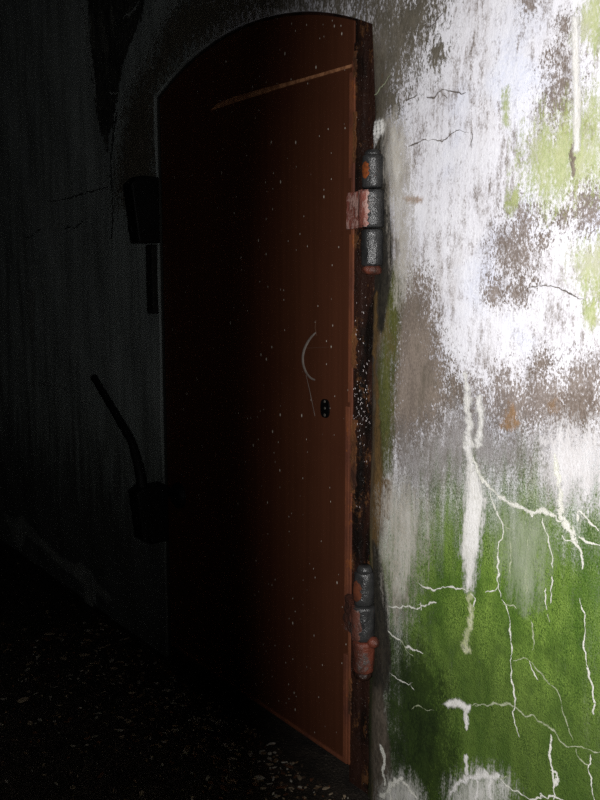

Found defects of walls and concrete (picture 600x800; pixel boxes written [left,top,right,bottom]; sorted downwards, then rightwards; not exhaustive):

crack [406,89,466,101]
water stain [569,16,581,177]
water stain [373,119,414,332]
water stain [371,371,600,800]
crack [388,453,600,800]